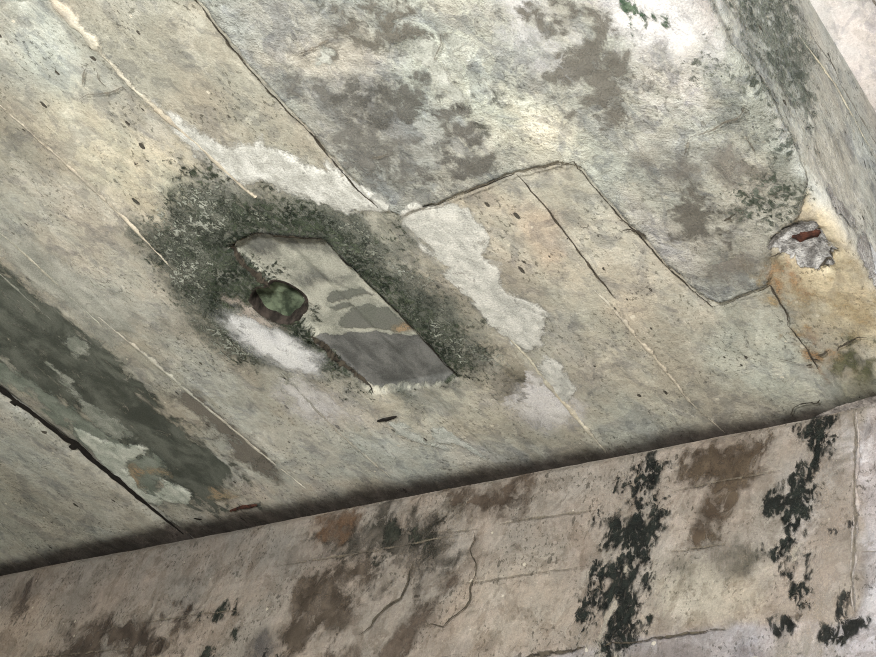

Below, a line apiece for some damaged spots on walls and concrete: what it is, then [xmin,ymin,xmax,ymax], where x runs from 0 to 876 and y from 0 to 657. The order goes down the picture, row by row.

crack [195,0,378,208]
damp [148,0,496,215]
damp [506,0,722,130]
crack [423,161,870,369]
spalling [767,221,837,270]
crack [277,529,589,635]
damp [0,202,876,657]
crack [500,510,591,525]